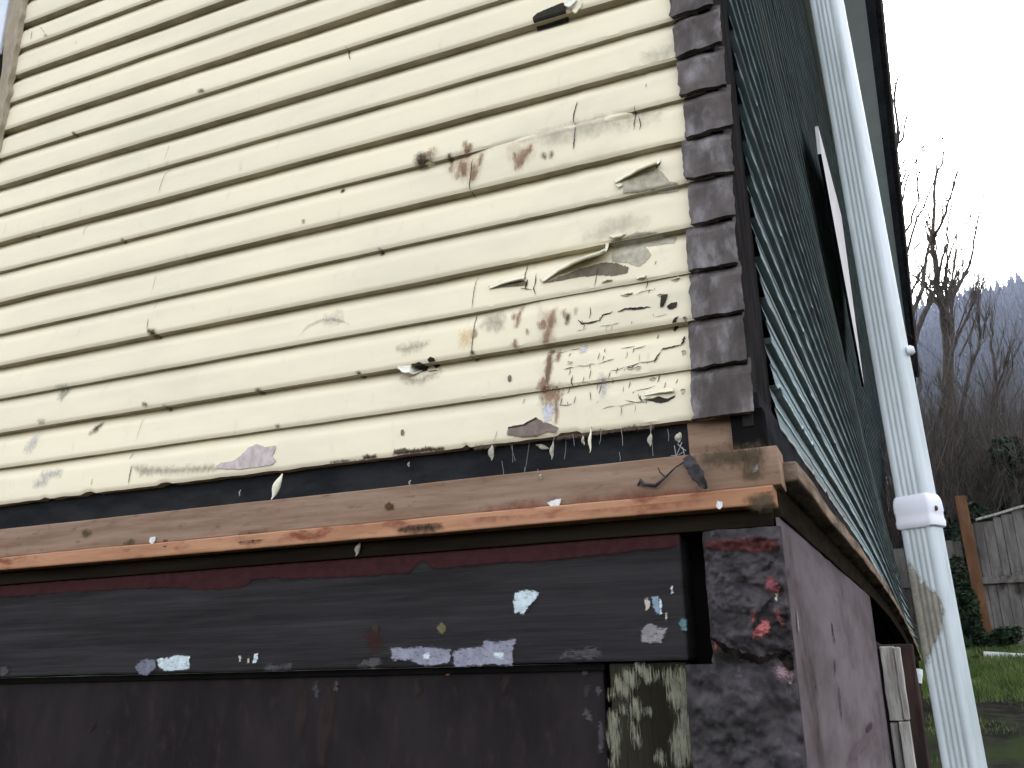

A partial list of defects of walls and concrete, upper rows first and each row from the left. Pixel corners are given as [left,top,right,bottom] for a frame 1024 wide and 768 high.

rust [448,142,482,196]
rust [513,145,552,168]
peeling [614,159,680,196]
peeling [488,232,677,295]
crack [556,262,685,413]
peeling [397,357,440,381]
rust [513,311,569,422]
spalling [507,403,654,440]
spalling [393,446,444,455]
spalling [513,590,538,614]
spalling [641,586,687,644]
spalling [358,639,516,669]